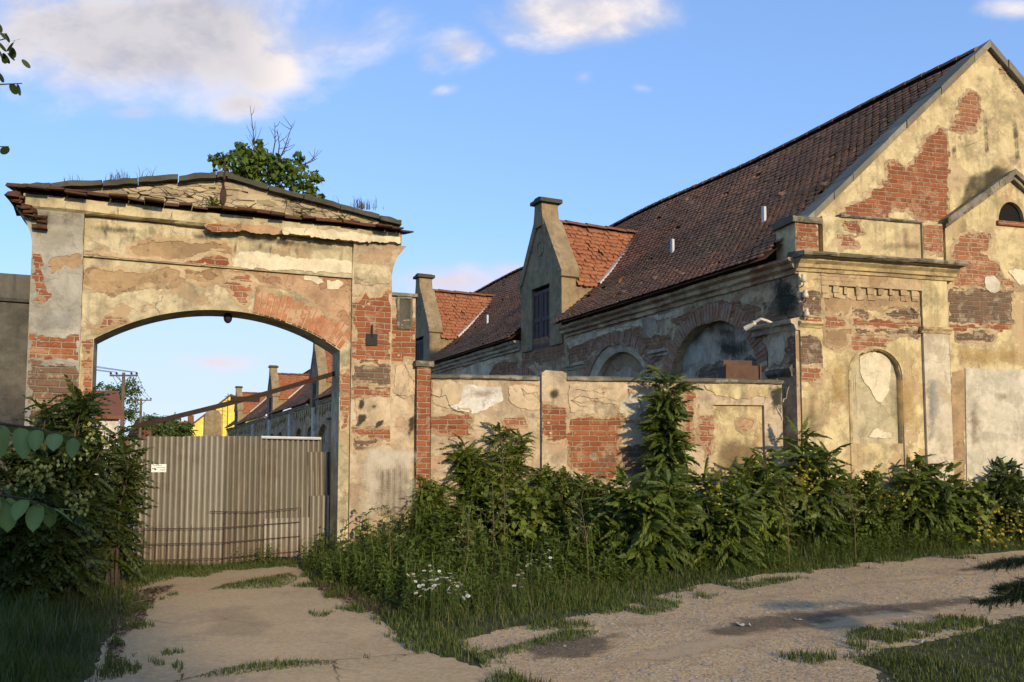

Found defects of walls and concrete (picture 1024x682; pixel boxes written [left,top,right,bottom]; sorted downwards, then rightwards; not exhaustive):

flaking render [836,88,1024,346]
flaking render [26,222,416,452]
flaking render [431,379,475,439]
crack [573,388,649,417]
flaking render [487,285,921,483]